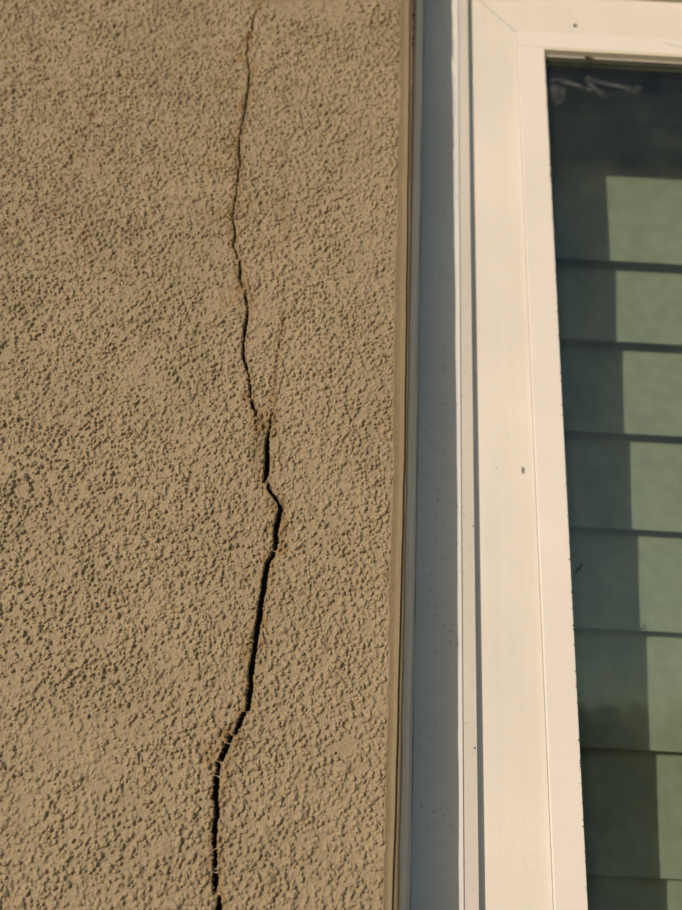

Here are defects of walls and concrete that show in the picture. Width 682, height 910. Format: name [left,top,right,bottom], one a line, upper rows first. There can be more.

crack [210,25,284,910]